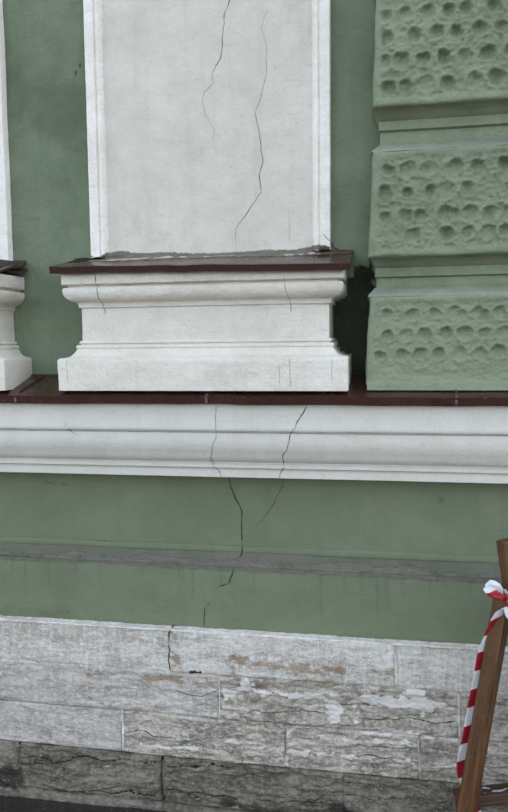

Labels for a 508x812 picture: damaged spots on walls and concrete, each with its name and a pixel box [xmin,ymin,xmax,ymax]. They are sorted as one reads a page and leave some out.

crack [204,413,243,624]
crack [263,408,306,519]